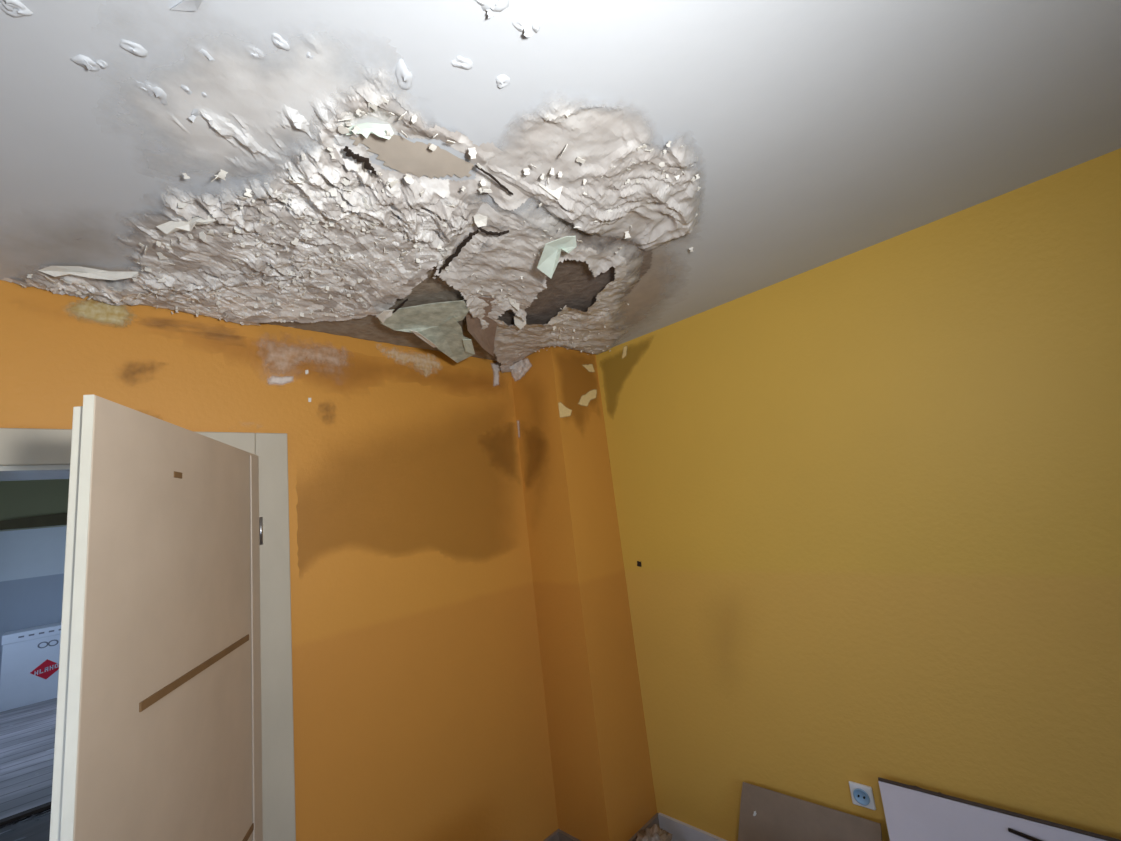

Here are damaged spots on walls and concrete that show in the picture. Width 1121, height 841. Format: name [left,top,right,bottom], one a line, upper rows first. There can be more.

crack [475,165,513,195]
peeling [601,141,701,191]
peeling [2,82,653,385]
crack [436,227,509,277]
peeling [558,389,597,418]